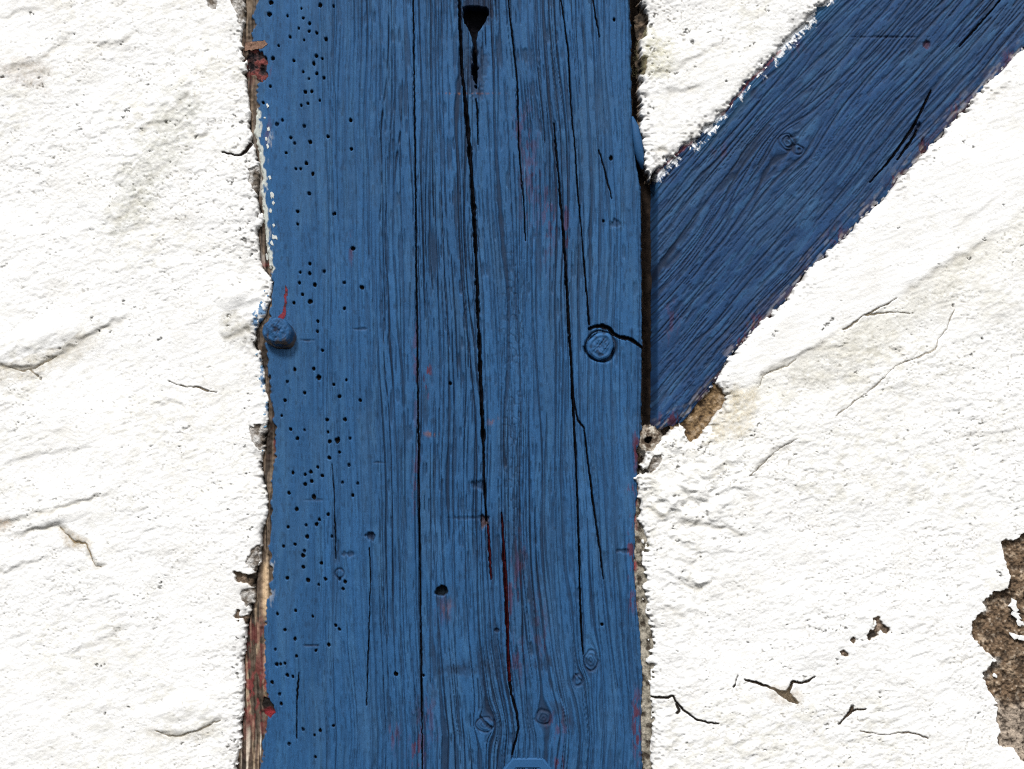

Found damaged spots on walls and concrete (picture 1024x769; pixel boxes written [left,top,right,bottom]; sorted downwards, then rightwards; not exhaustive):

crack [870,91,931,182]
crack [554,1,642,654]
crack [458,0,519,754]
spalling [669,330,751,442]
crack [60,527,99,567]
crack [651,695,719,724]
crack [733,677,814,704]
spalling [837,616,889,660]
crack [838,706,928,739]
spalling [971,533,1024,761]